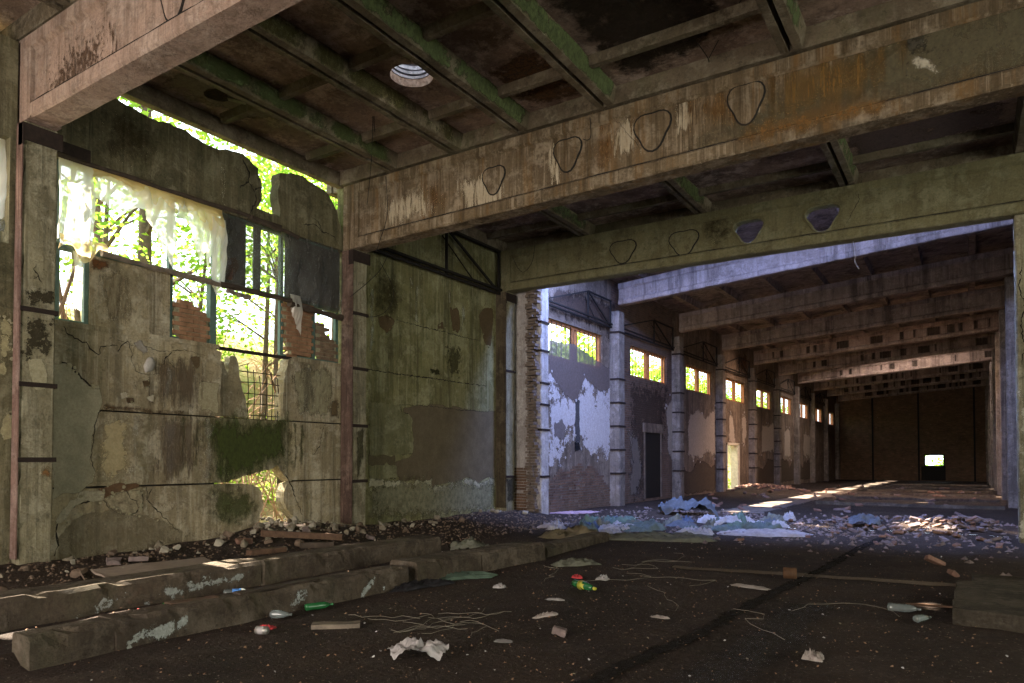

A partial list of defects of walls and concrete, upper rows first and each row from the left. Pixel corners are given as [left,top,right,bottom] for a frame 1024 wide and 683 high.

peeling [42,17,117,92]
mould [18,288,57,365]
crack [64,327,205,375]
mould [430,346,462,377]
spalling [514,289,615,513]
crack [81,487,173,526]
water stain [357,428,516,519]